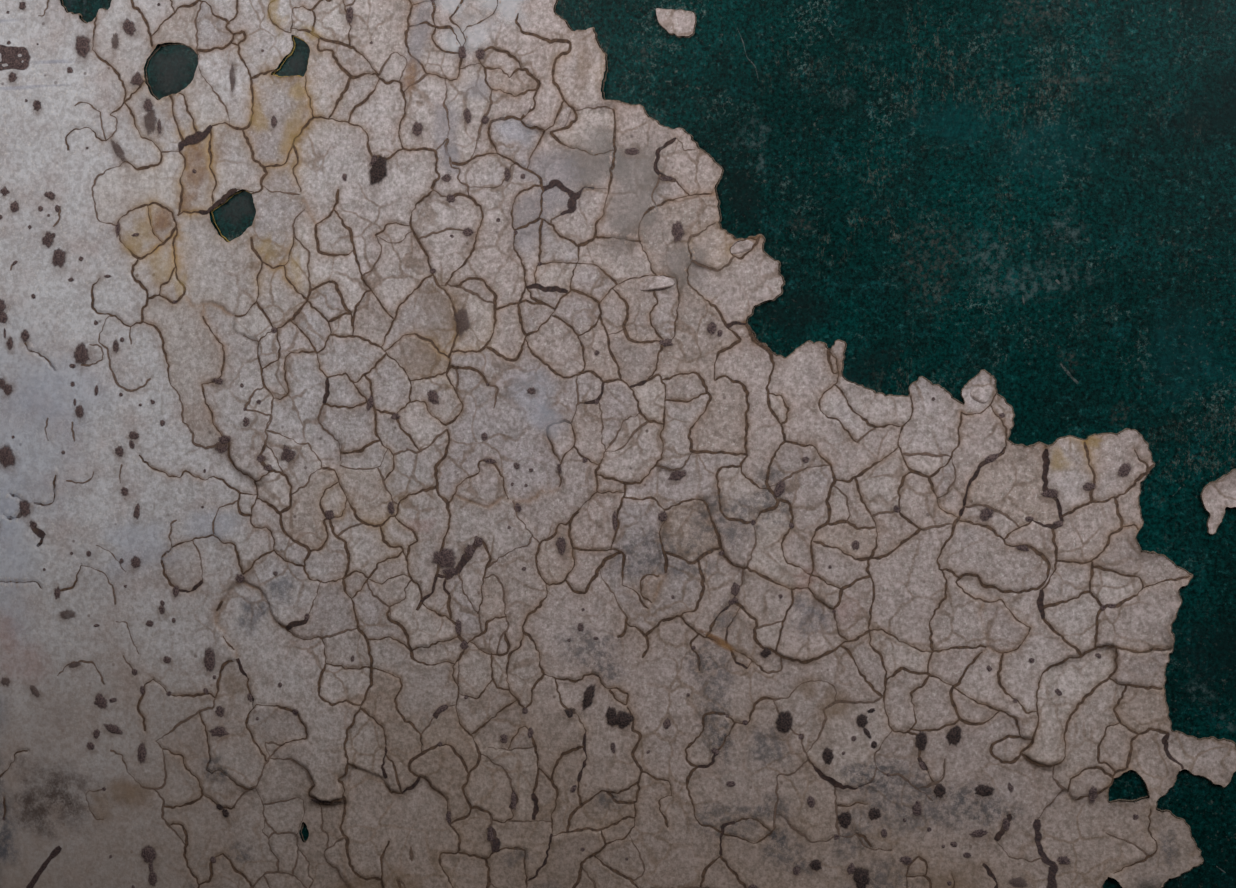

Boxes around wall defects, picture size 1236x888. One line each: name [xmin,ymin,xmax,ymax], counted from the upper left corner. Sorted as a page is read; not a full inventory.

peeling [62,0,112,23]
crack [81,166,219,449]
peeling [145,43,198,100]
peeling [211,190,256,242]
peeling [272,35,310,77]
crack [131,0,675,361]
peeling [554,0,1236,750]
crack [161,189,671,888]
crack [512,264,1190,850]
crack [110,658,316,888]
crack [994,684,1184,888]
peeling [1107,769,1236,888]